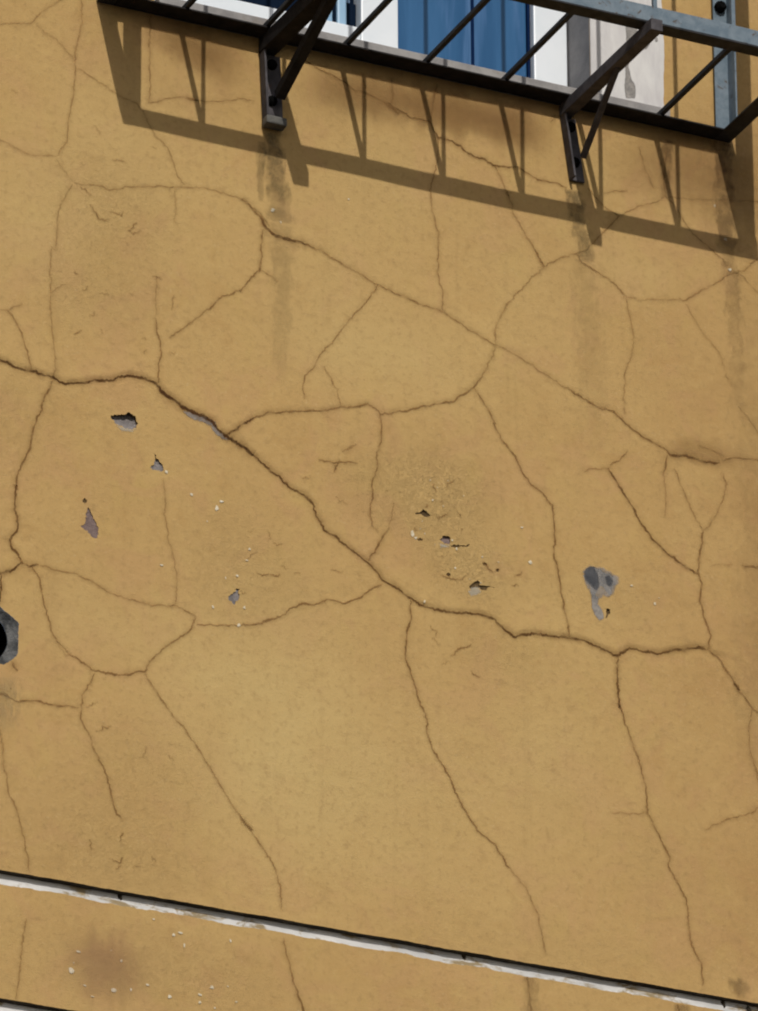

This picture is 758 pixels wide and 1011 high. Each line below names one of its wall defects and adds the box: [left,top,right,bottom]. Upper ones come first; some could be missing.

peeling [625,64,636,98]
crack [309,62,563,186]
spalling [111,412,138,430]
spalling [150,453,168,474]
spalling [81,498,99,538]
spalling [411,479,446,541]
crack [0,211,752,907]
spalling [440,536,470,550]
spalling [225,575,246,609]
spalling [445,567,494,590]
spalling [583,566,618,620]